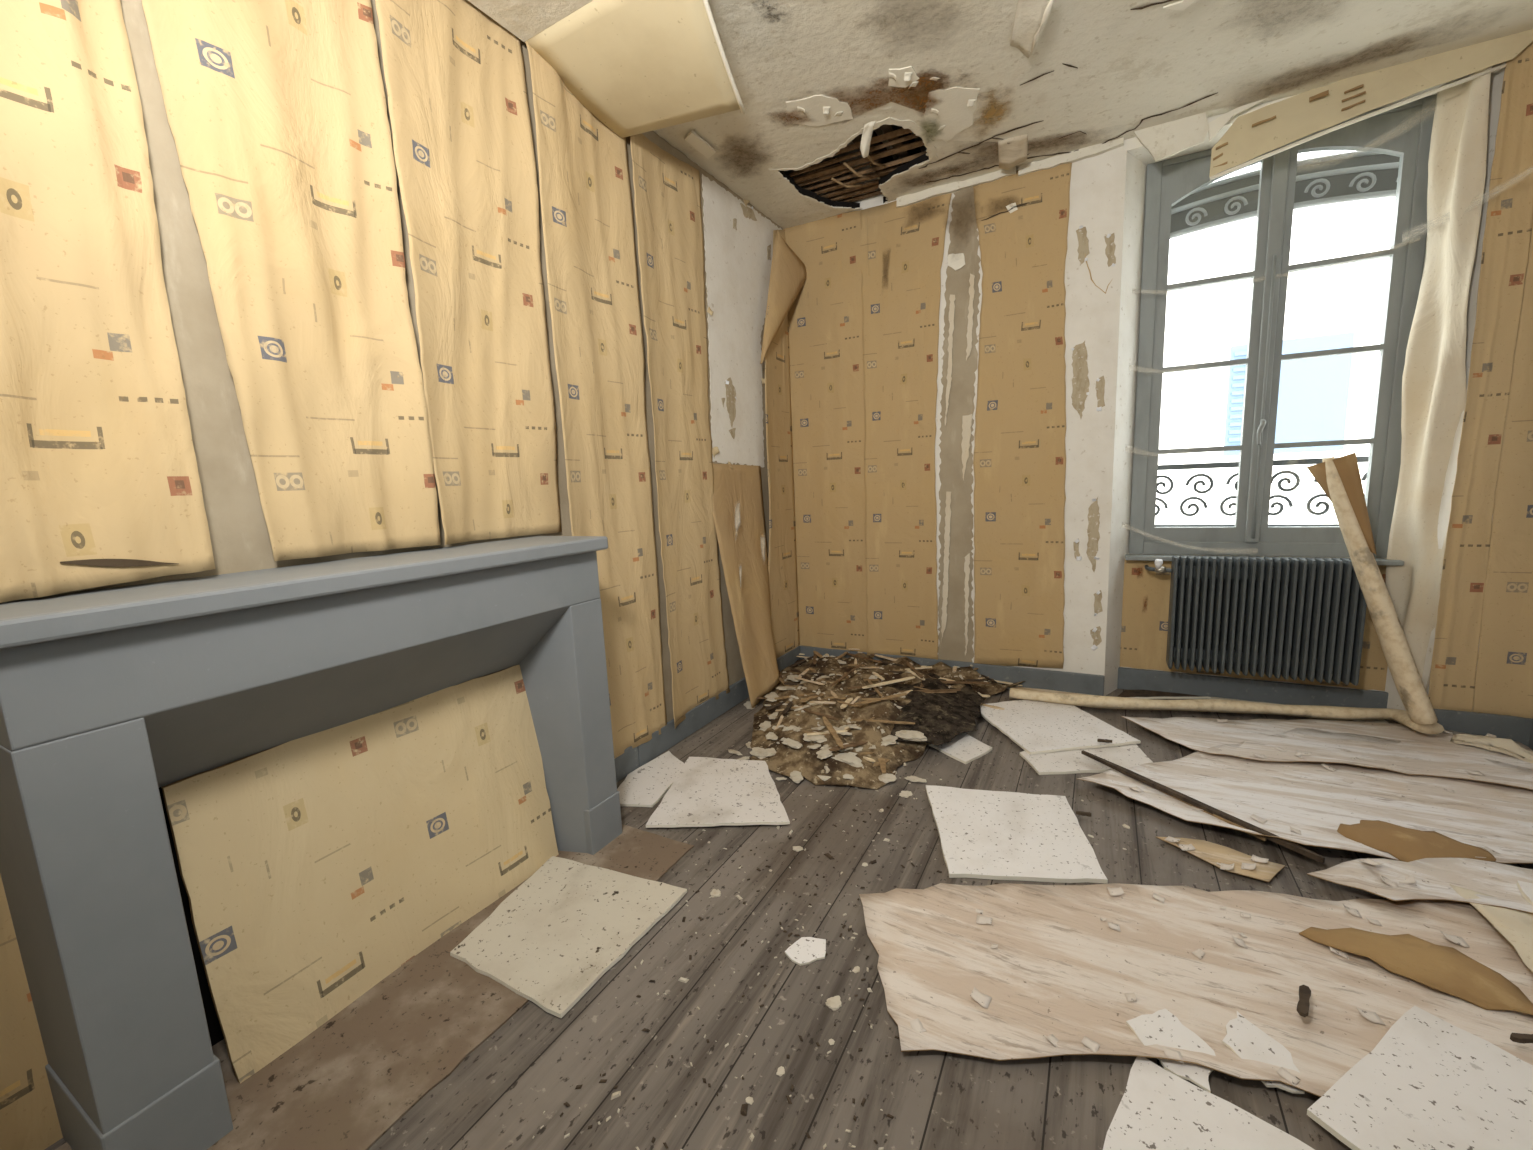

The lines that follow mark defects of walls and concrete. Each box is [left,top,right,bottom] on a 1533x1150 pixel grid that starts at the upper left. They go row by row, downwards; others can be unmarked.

leakage [778,113,804,123]
flaking render [786,95,876,158]
leakage [833,74,944,113]
flaking render [888,66,980,142]
leakage [980,96,1008,165]
leakage [1027,133,1084,151]
flaking render [1076,225,1116,267]
flaking render [1071,341,1105,418]
peeling [941,253,975,655]
flaking render [1073,497,1100,572]
flaking render [1090,590,1103,650]